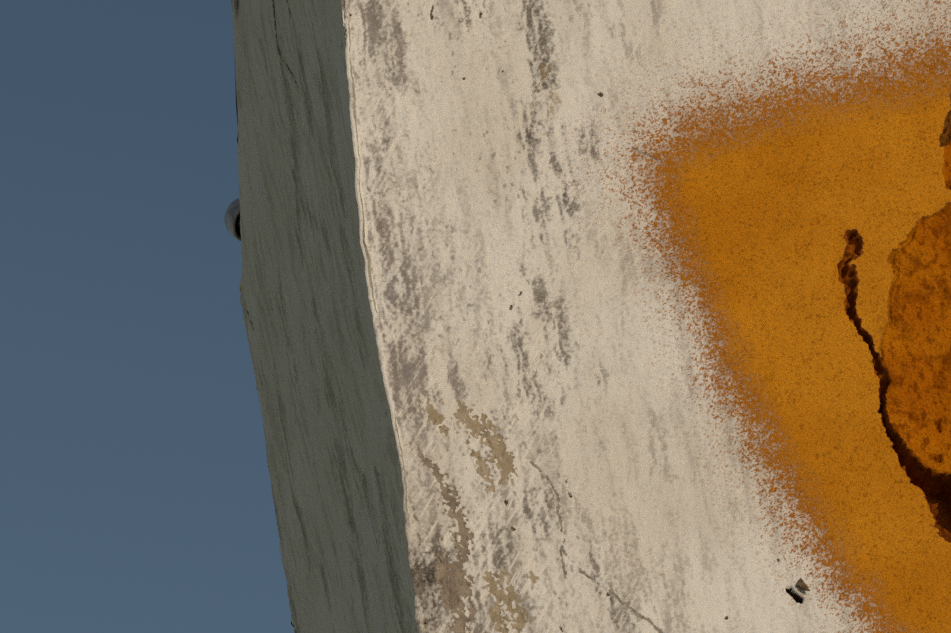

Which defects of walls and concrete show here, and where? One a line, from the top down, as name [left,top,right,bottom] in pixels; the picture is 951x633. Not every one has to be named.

spalling [939,85,951,190]
peeling [418,398,518,493]
crack [837,202,951,543]
spalling [880,209,951,476]
peeling [417,450,533,633]
crack [530,461,663,633]